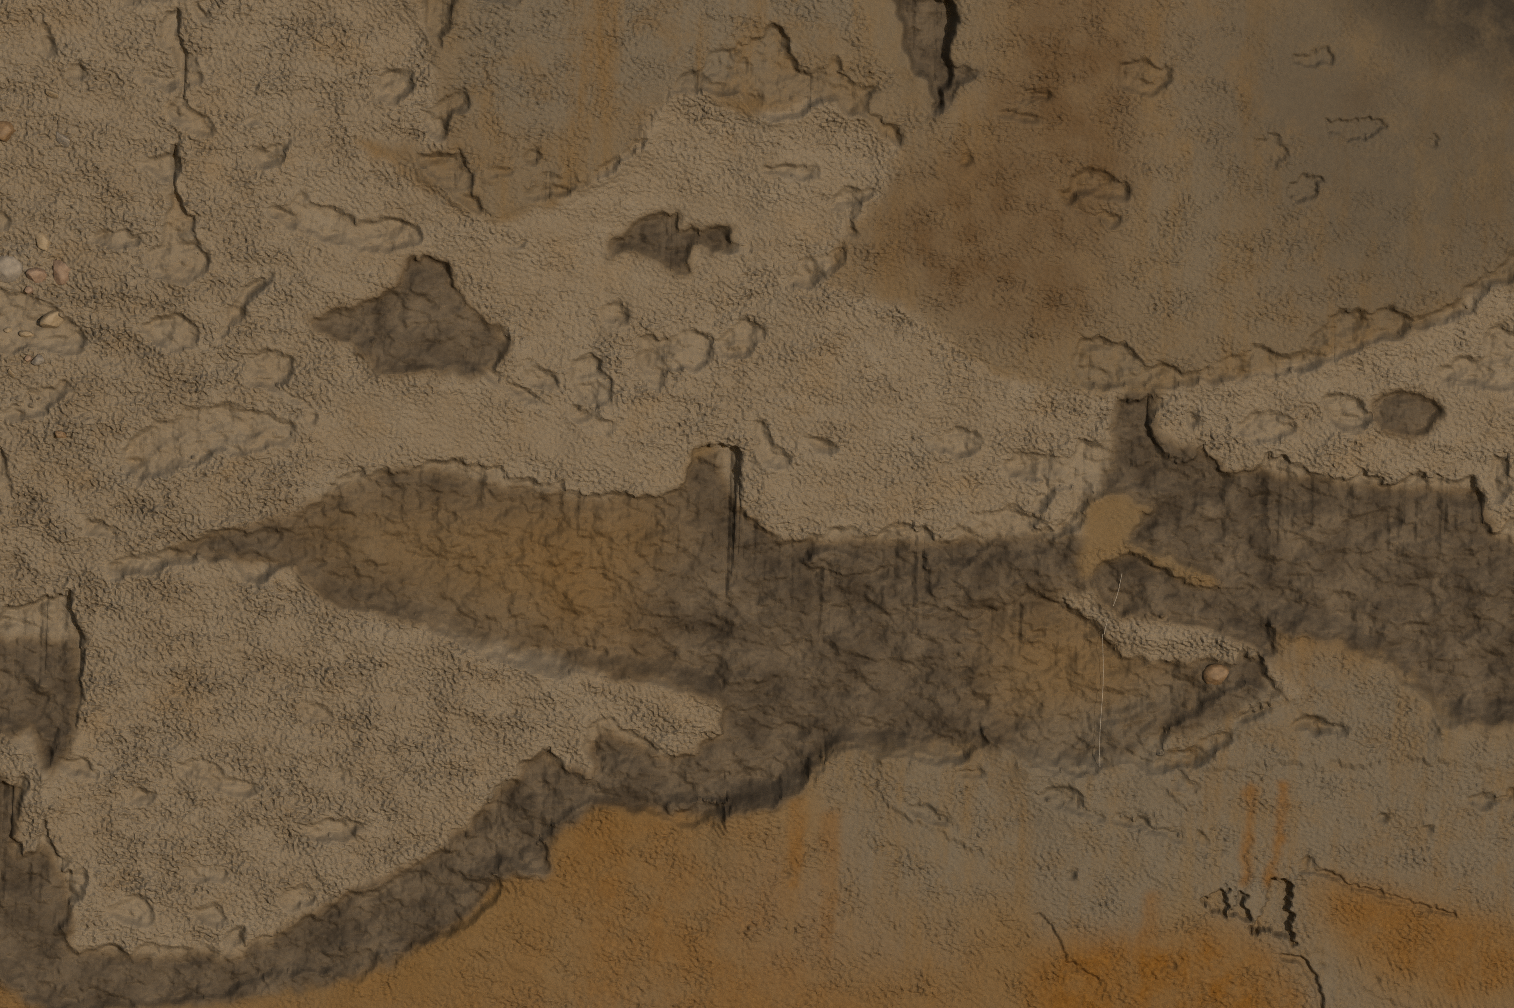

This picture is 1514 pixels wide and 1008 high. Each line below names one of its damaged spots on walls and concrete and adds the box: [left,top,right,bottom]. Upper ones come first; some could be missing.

spalling [1283,171,1328,206]
spalling [0,0,1223,962]
spalling [1154,283,1514,541]
peeling [805,589,1514,937]